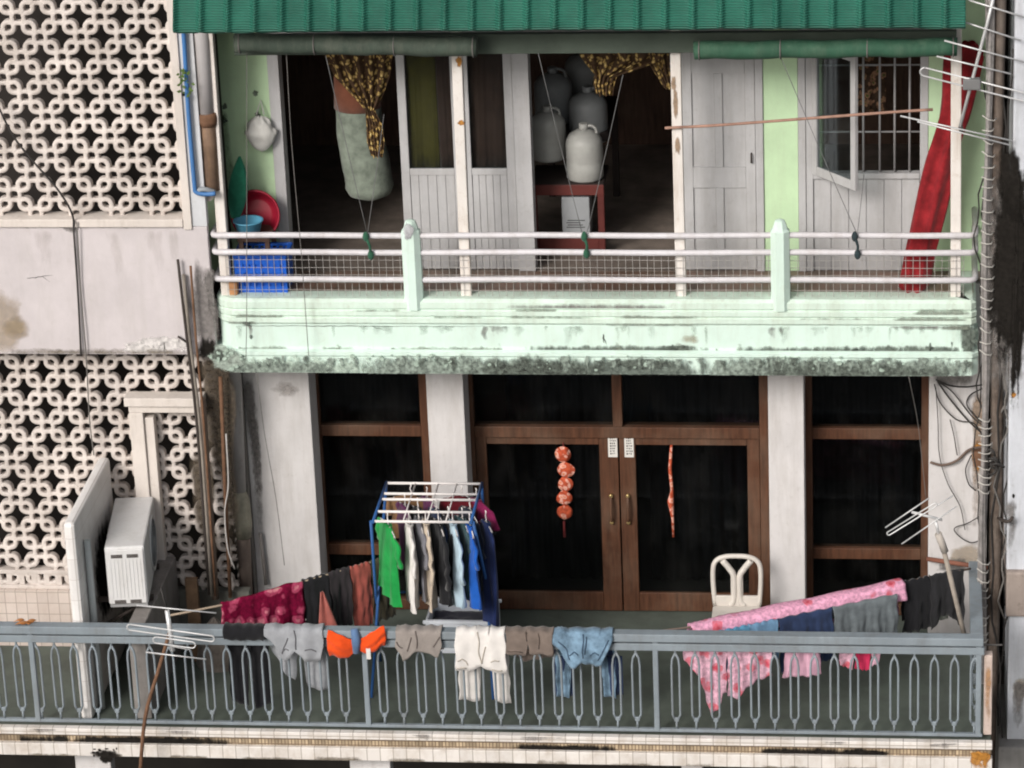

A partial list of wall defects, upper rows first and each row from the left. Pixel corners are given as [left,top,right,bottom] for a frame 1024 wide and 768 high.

leakage [191,148,1024,537]
corrosion [970,751,990,768]